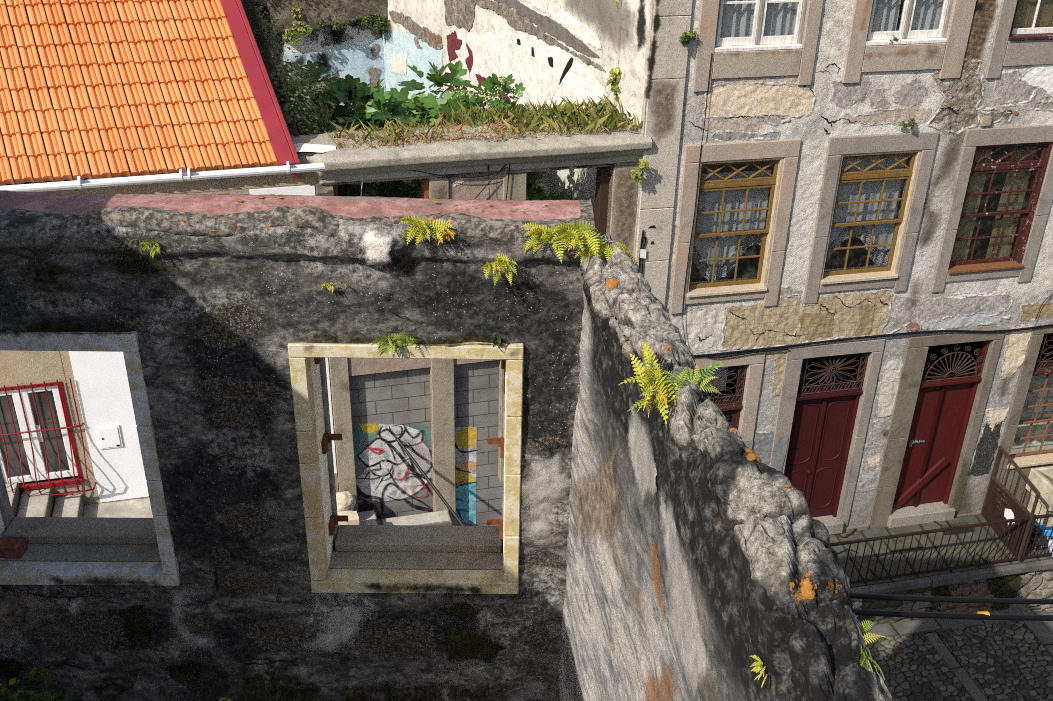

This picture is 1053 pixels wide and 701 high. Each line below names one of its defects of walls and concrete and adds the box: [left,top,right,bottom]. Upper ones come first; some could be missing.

peeling [280,0,609,119]
crack [691,114,788,131]
spalling [701,75,816,142]
crack [801,63,861,134]
spalling [829,58,1053,134]
crack [731,312,803,341]
crack [820,296,888,315]
peeling [680,285,1053,397]